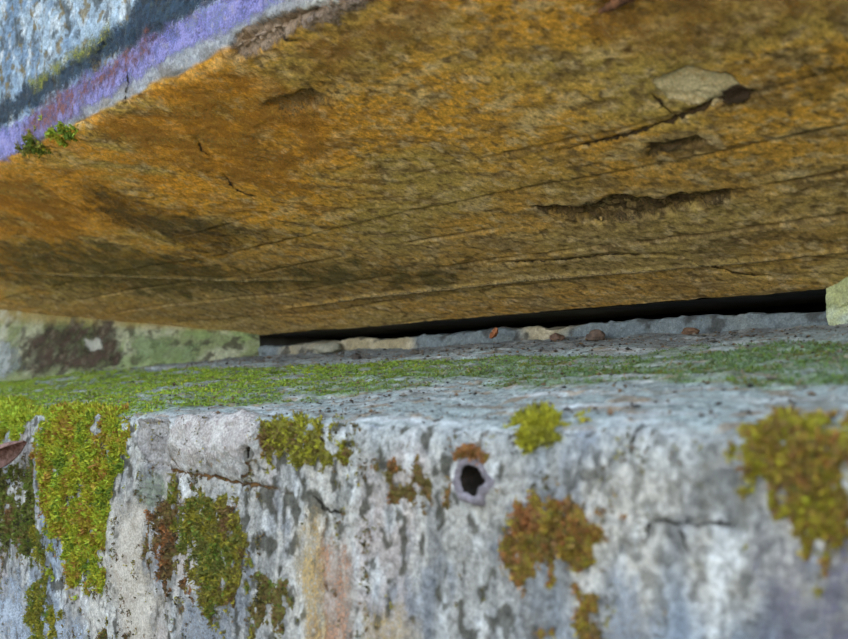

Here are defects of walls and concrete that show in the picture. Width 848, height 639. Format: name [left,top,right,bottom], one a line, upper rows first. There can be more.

spalling [653,66,755,106]
crack [566,94,735,149]
spalling [536,187,744,222]